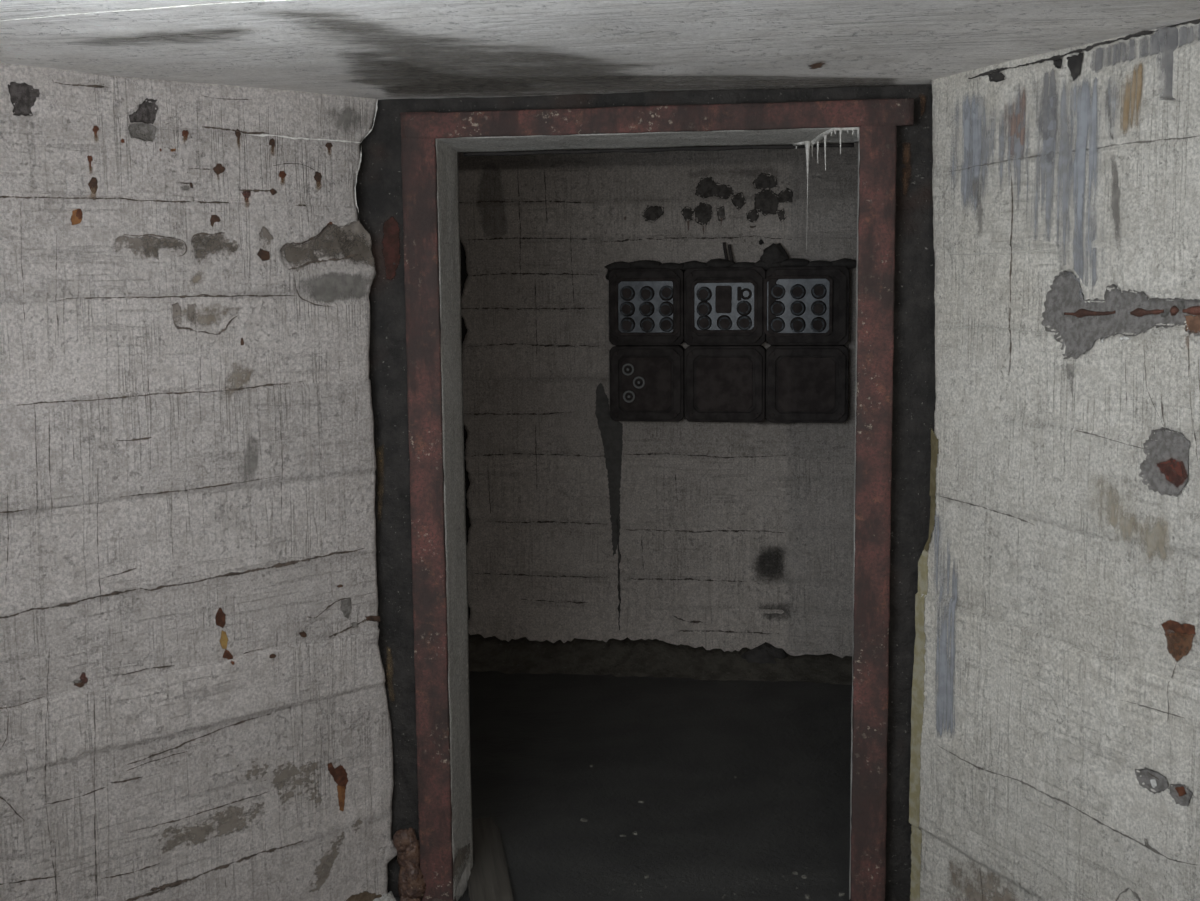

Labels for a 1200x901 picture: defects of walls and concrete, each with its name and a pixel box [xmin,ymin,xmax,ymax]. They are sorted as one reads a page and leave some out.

spalling [8,82,40,116]
water stain [85,30,242,44]
water stain [282,14,894,97]
water stain [1157,27,1179,100]
rust [87,155,98,200]
rust [240,171,287,207]
water stain [952,64,1142,293]
peeling [257,220,374,307]
spalling [1042,270,1200,359]
spalling [1139,396,1191,497]
rust [1161,620,1195,718]
rust [328,763,348,811]